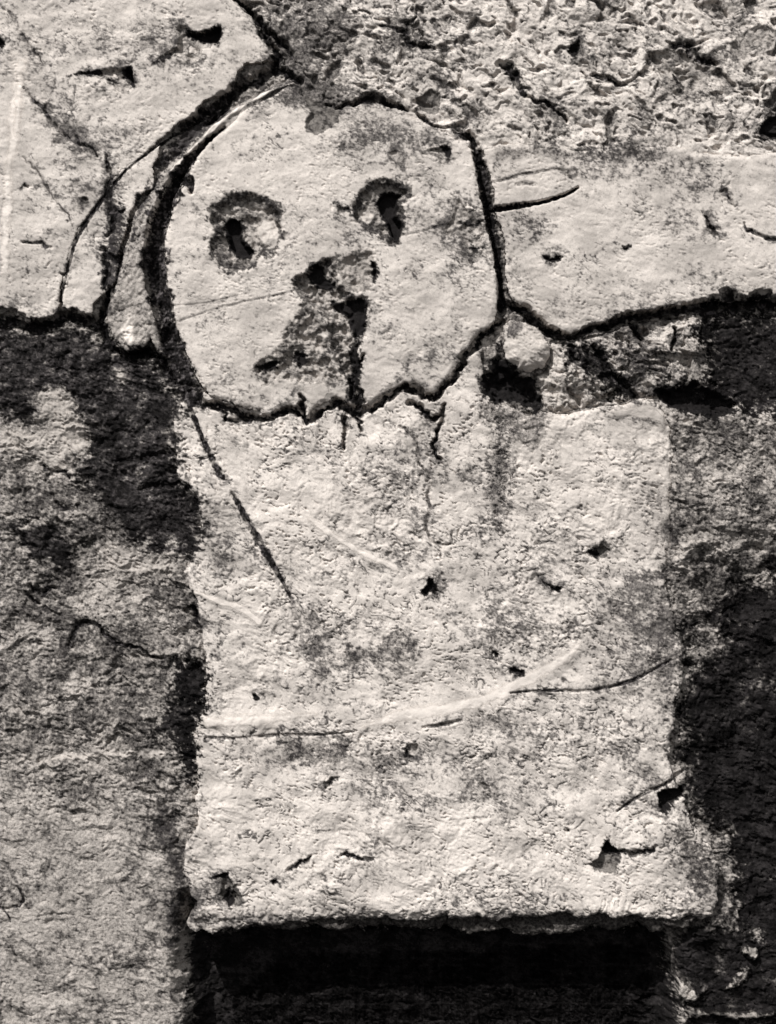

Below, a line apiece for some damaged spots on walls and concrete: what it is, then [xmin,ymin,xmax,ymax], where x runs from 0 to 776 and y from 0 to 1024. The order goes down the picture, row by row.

crack [0,0,776,604]